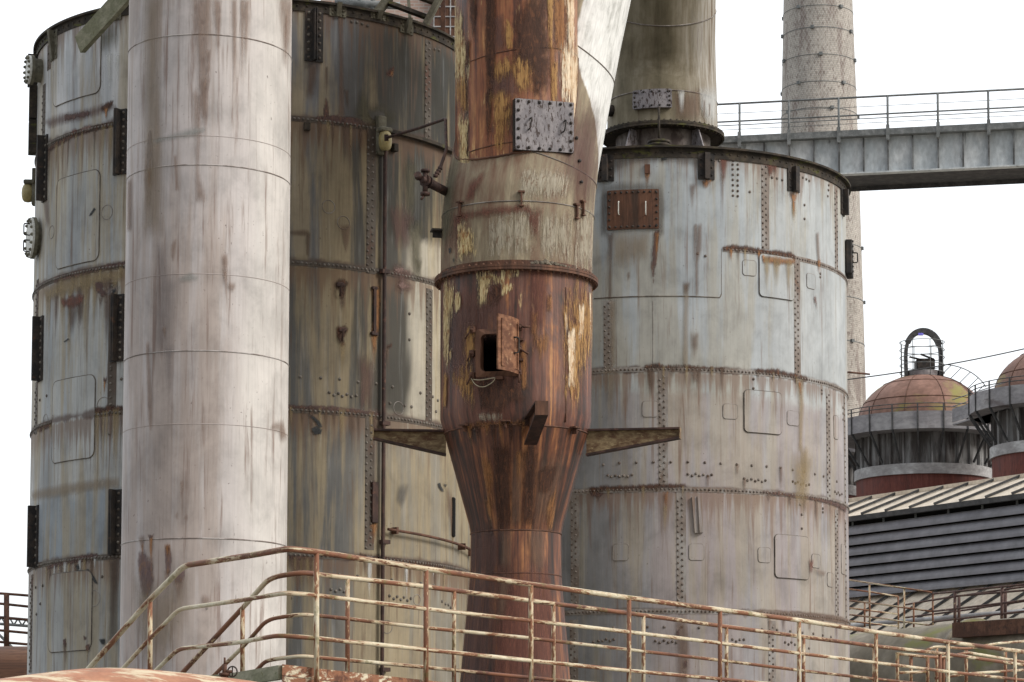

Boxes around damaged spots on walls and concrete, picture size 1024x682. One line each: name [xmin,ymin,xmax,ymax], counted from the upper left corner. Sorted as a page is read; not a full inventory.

corrosion [465,0,496,139]
corrosion [510,0,567,94]
peeling [520,169,569,198]
peeling [453,223,476,262]
peeling [476,270,519,308]
peeling [489,209,592,269]
corrosion [723,244,795,277]
peeling [442,280,504,420]
peeling [564,282,593,401]
corrosion [645,363,725,388]
corrosion [755,368,807,465]
corrosion [461,270,556,682]